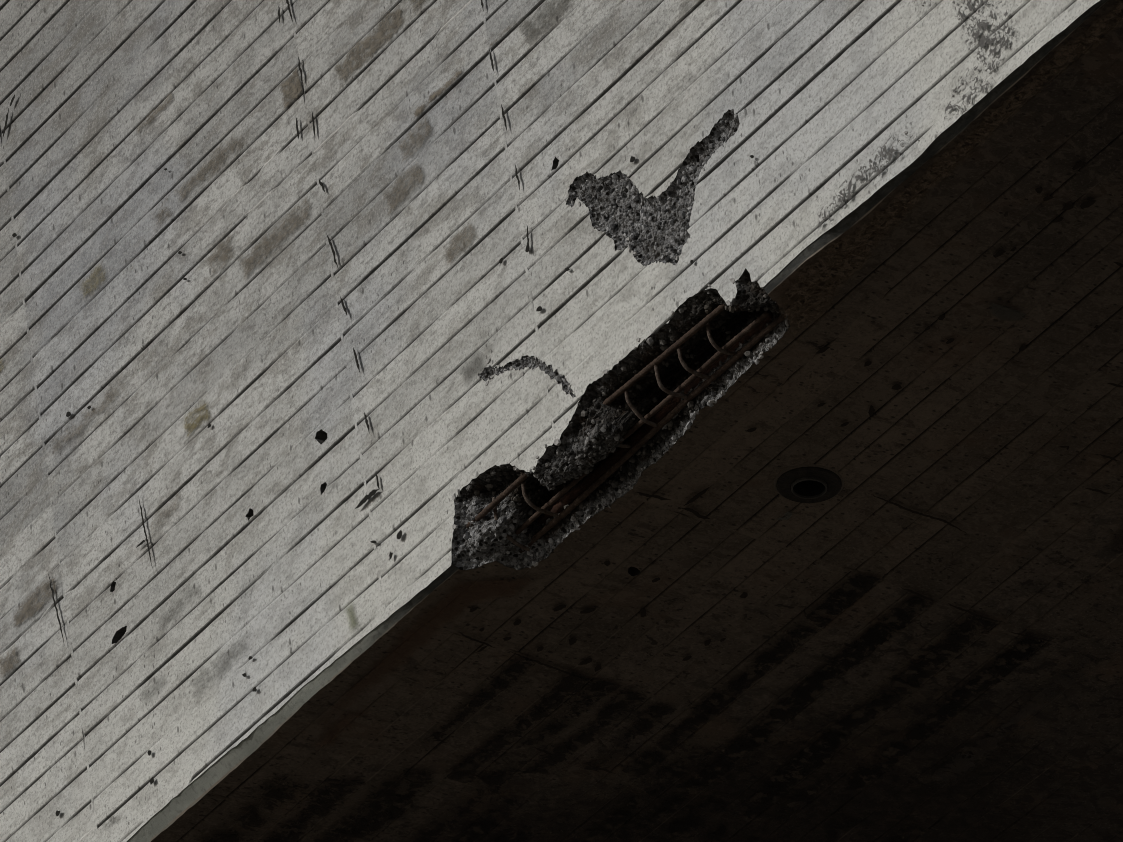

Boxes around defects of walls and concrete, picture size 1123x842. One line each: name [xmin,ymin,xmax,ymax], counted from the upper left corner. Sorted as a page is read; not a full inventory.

spalling [564,109,740,266]
spalling [452,269,790,570]